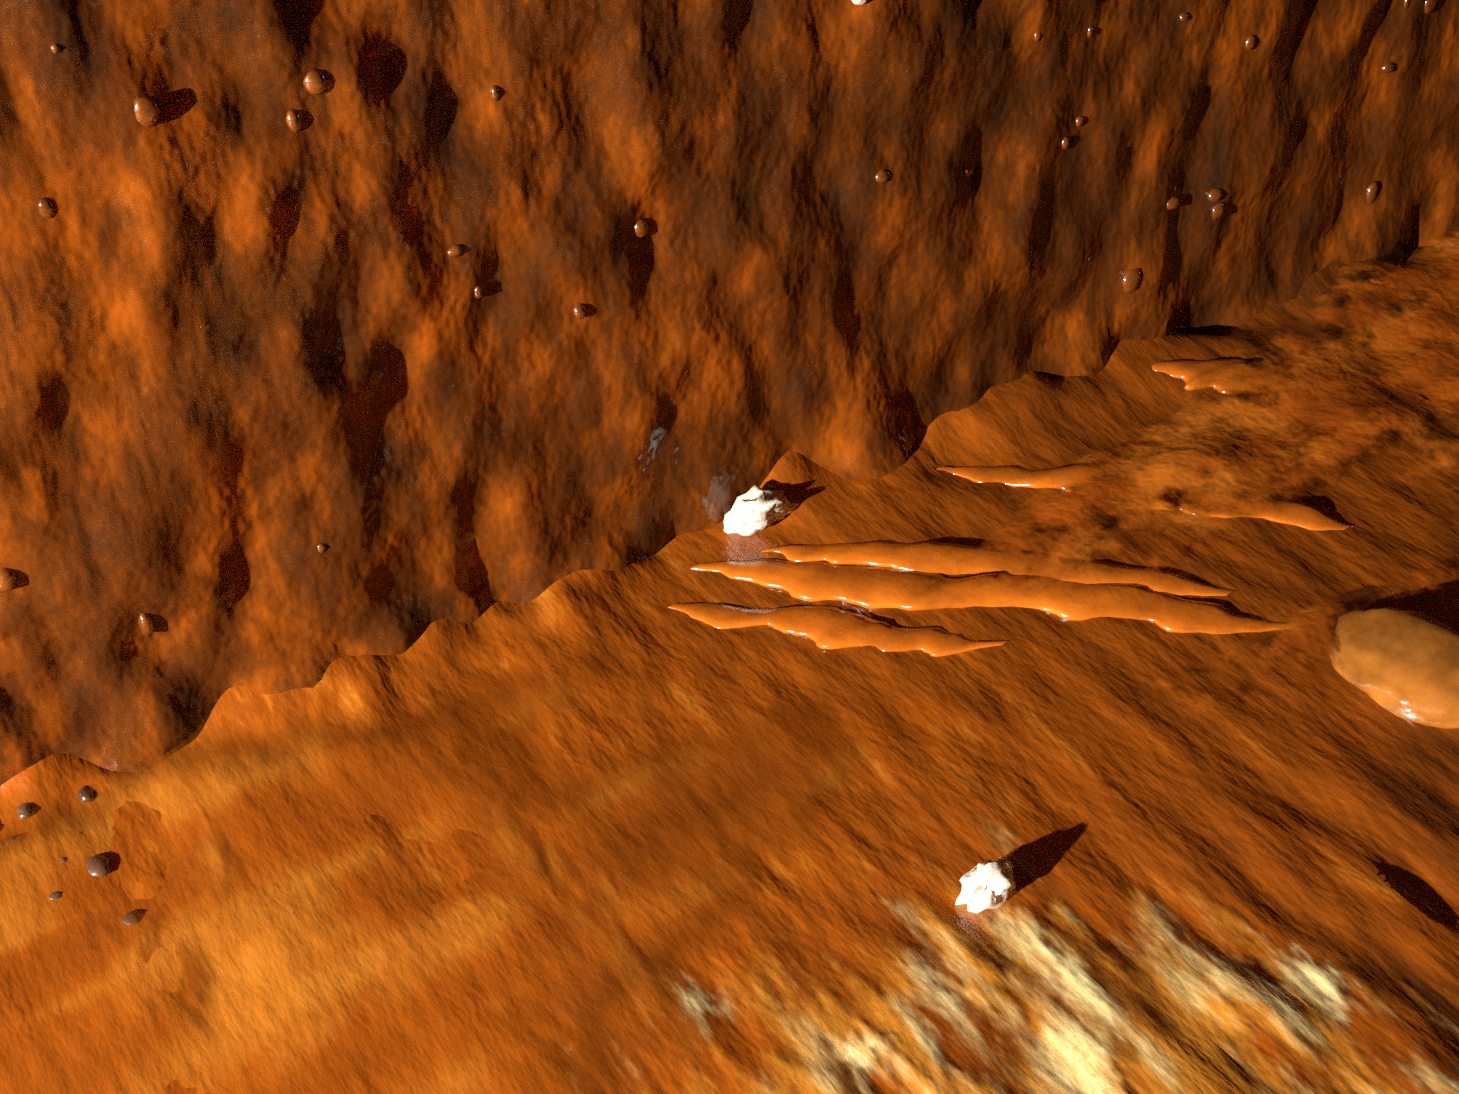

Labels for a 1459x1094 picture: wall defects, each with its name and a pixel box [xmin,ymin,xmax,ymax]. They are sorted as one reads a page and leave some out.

rust [182,249,217,372]
rust [0,683,839,1094]